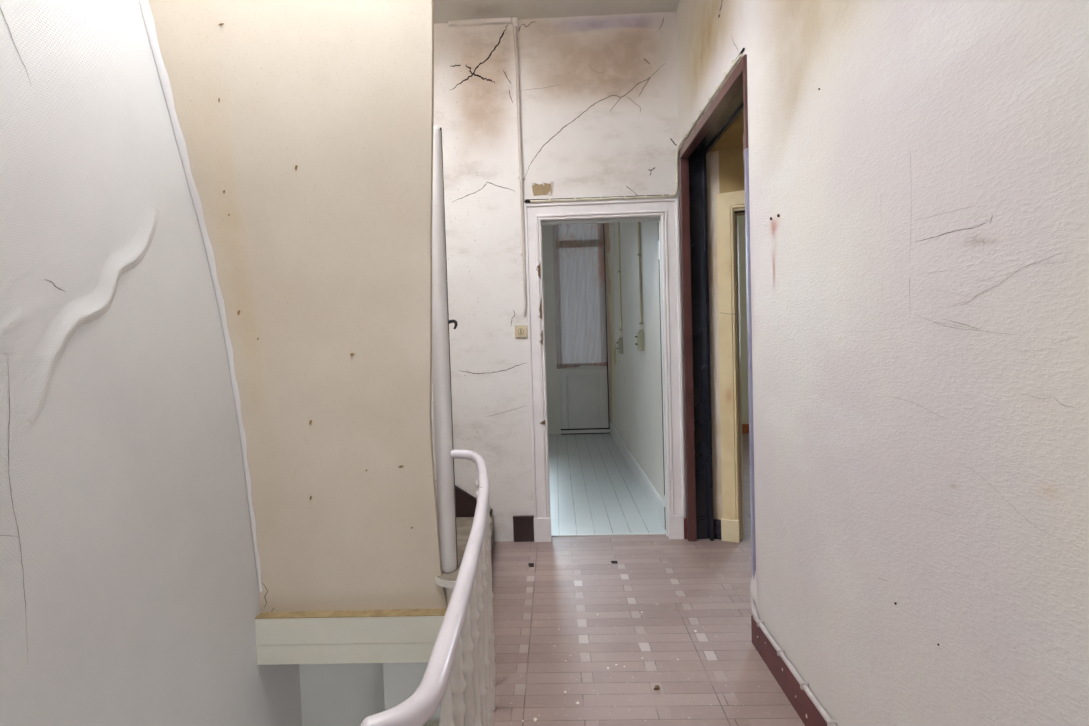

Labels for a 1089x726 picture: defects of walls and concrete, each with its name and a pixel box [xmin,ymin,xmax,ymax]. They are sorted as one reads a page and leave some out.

crack [450,22,559,103]
peeling [532,181,554,196]
crack [455,59,666,201]
crack [909,206,1074,351]
crack [0,368,28,652]